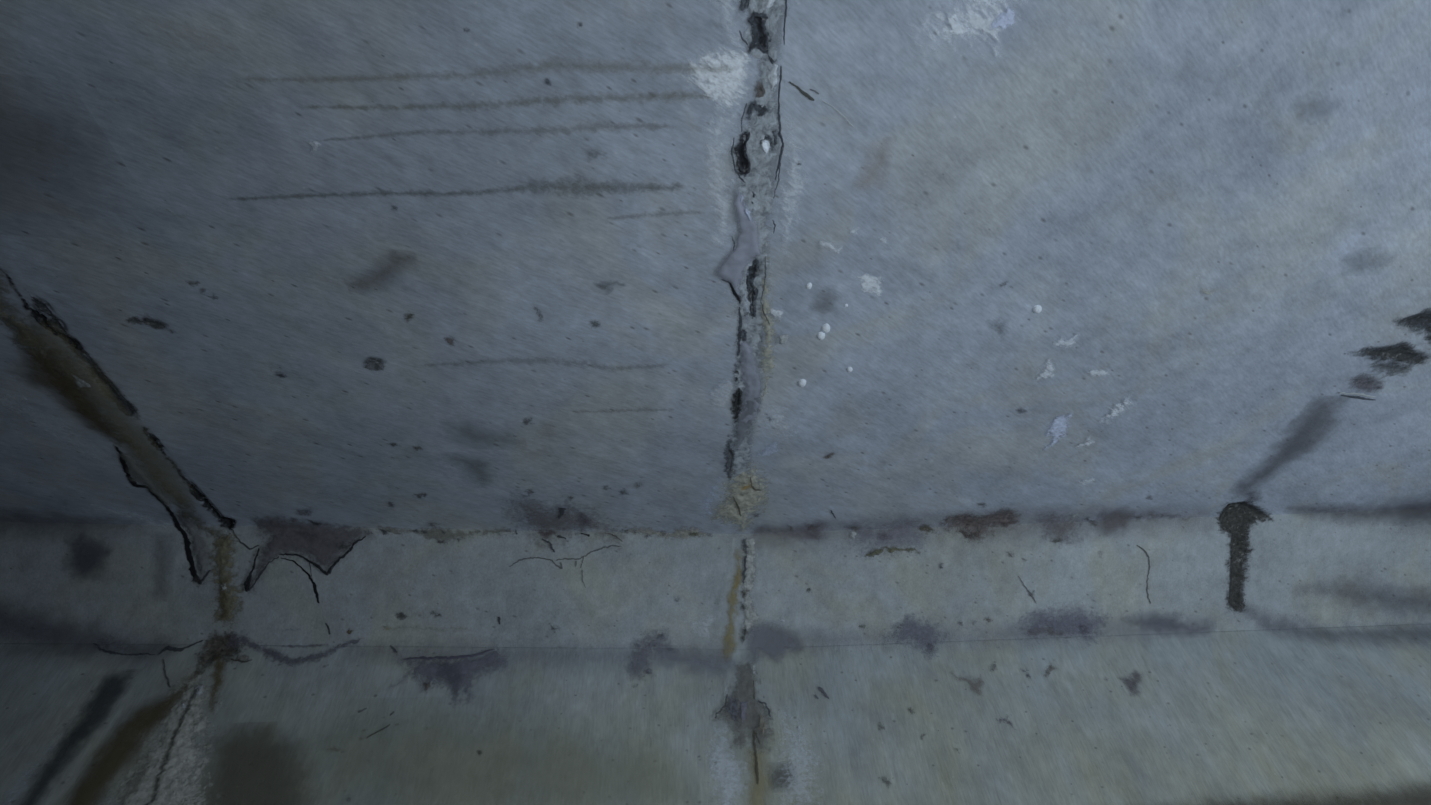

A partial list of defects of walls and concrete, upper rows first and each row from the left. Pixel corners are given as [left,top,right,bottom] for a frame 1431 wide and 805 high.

crack [721,0,855,363]
crack [115,446,210,584]
crack [231,529,334,635]
peeling [244,492,710,592]
crack [158,640,203,687]